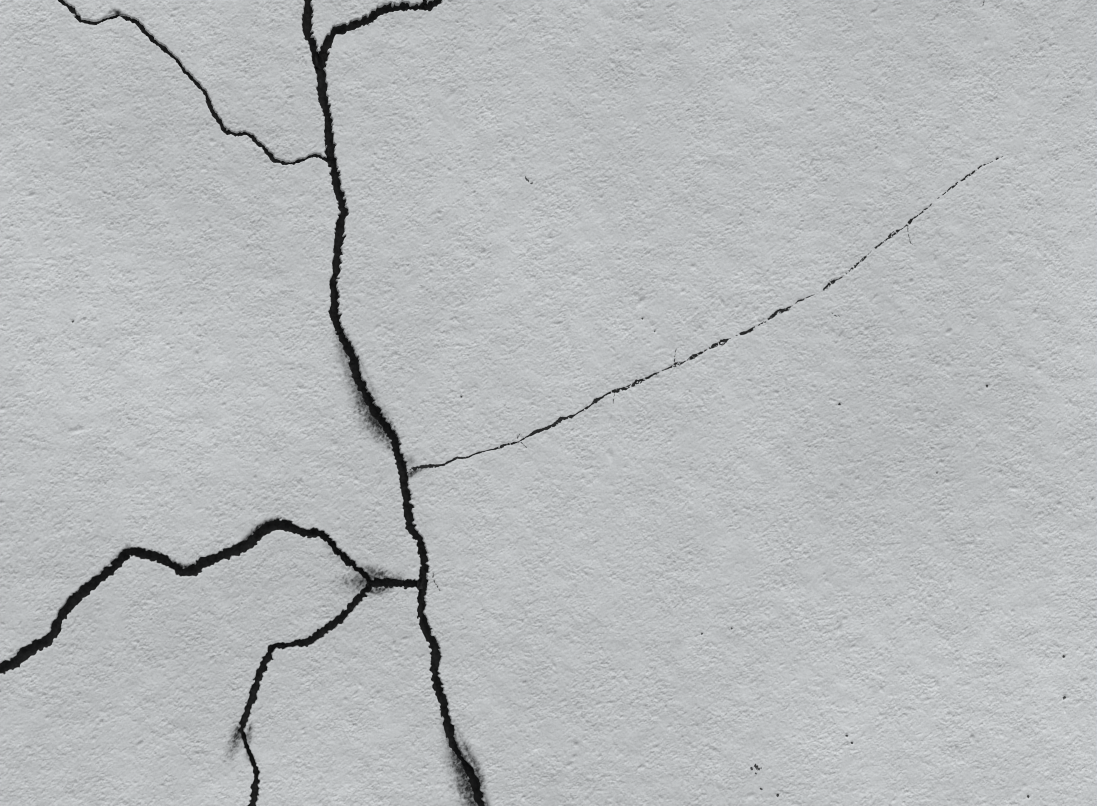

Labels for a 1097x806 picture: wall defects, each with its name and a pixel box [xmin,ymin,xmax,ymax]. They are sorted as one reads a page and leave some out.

crack [0,0,813,806]
crack [823,156,1003,291]